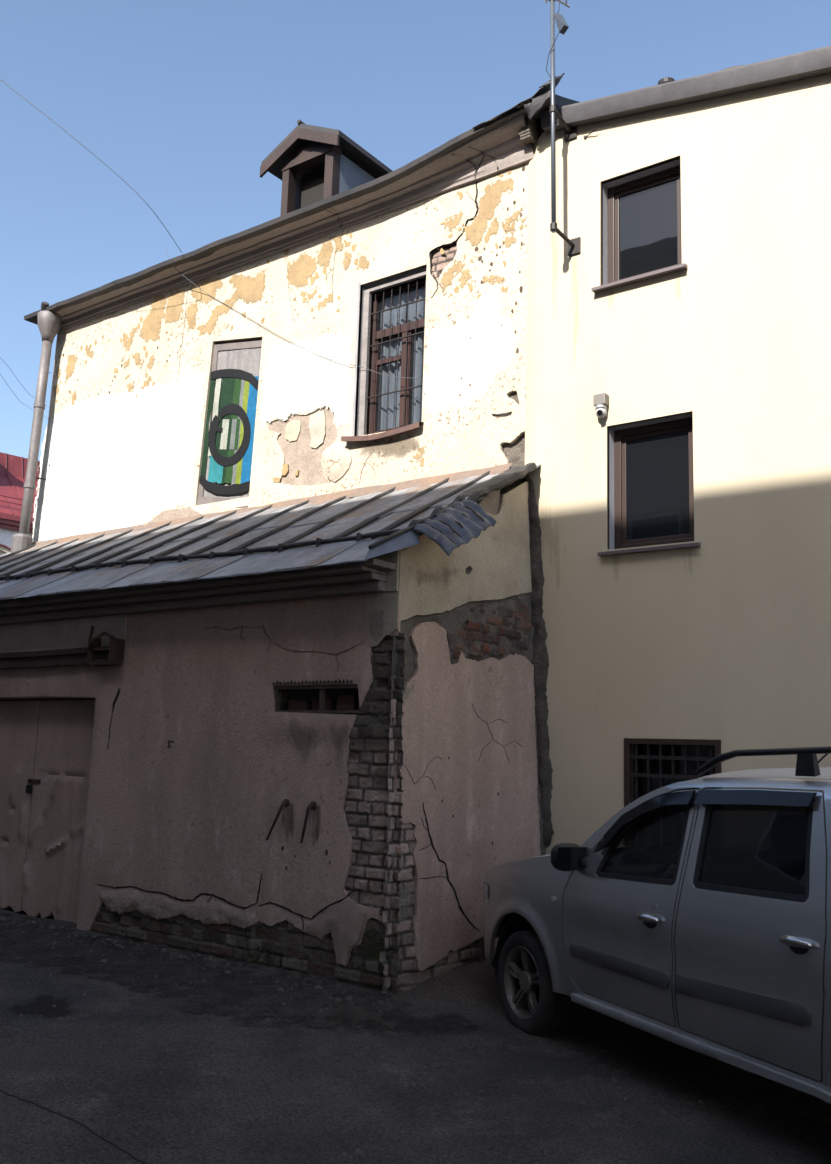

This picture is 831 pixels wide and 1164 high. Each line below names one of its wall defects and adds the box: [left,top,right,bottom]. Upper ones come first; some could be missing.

crack [429,147,498,298]
peeling [432,165,527,313]
flaking render [268,406,338,486]
crack [203,626,361,671]
flaking render [91,434,554,995]
crack [97,874,354,933]
crack [405,757,479,931]